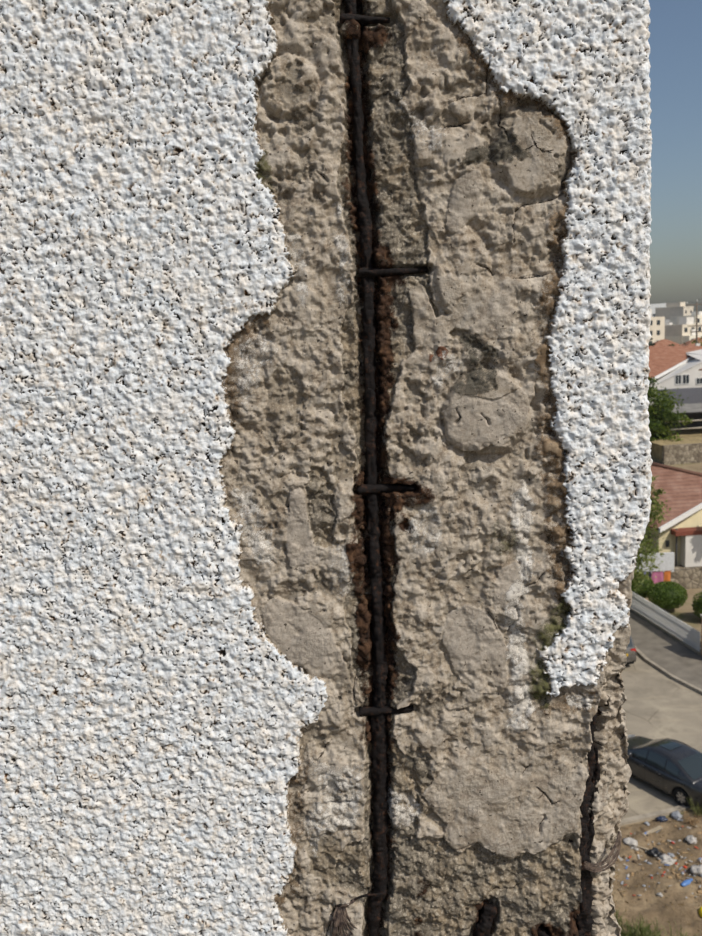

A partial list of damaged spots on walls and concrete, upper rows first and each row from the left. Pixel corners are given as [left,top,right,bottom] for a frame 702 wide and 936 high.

corrosion [341,0,435,936]
spalling [220,0,638,936]
corrosion [473,899,493,932]